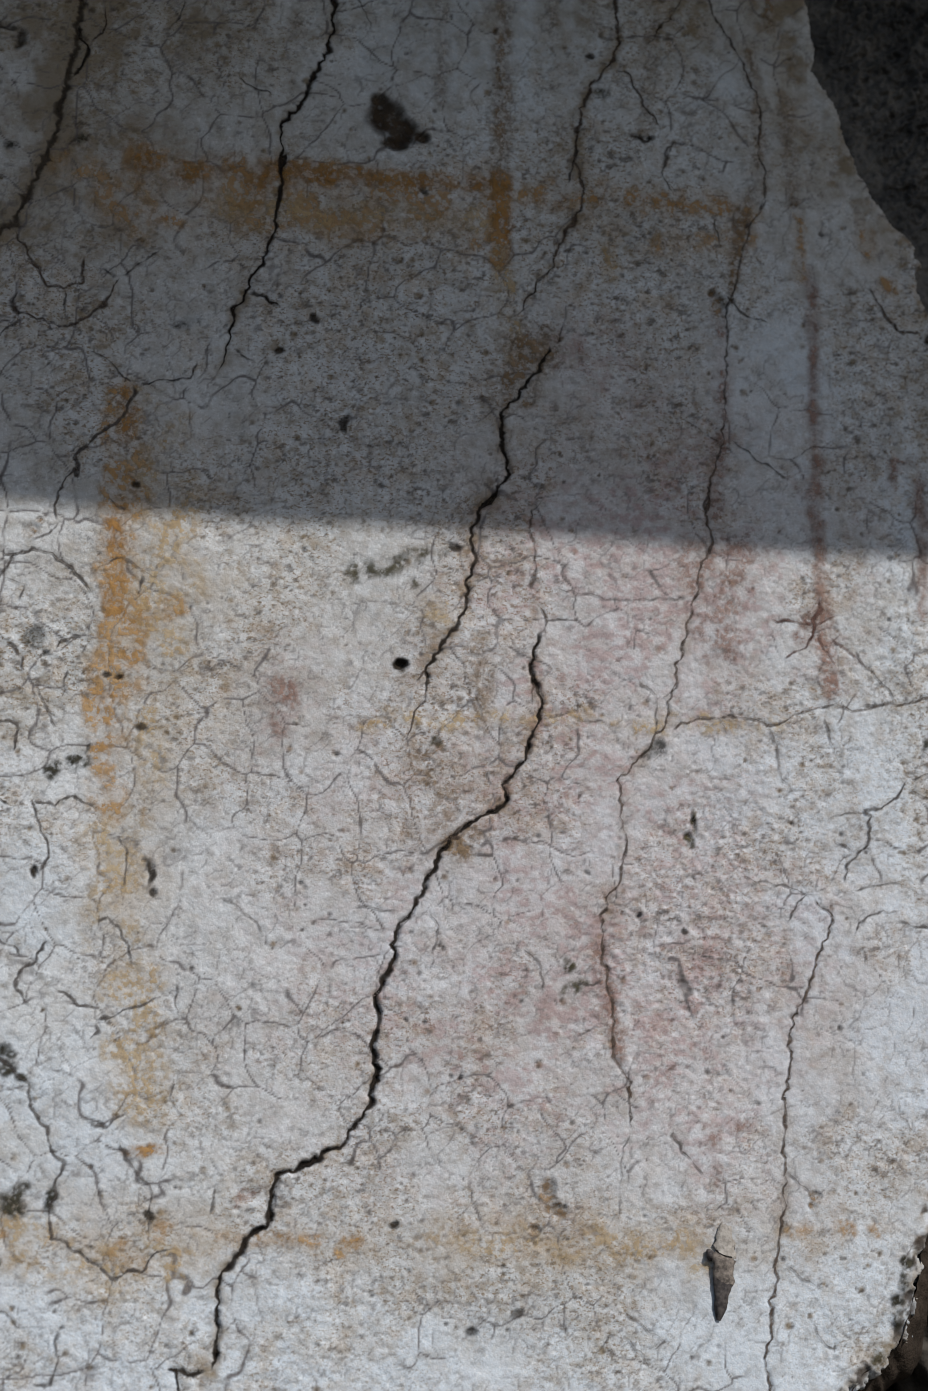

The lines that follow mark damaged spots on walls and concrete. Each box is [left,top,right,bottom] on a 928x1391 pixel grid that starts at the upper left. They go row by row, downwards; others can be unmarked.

crack [0,0,361,594]
corrosion [181,157,494,247]
crack [523,0,683,309]
corrosion [624,190,758,217]
spalling [804,0,928,314]
corrosion [83,386,194,818]
crack [408,330,562,735]
crack [579,0,928,1123]
crack [0,1057,167,1280]
crack [168,509,653,1391]
crack [746,775,928,1391]
spalling [852,1237,928,1391]